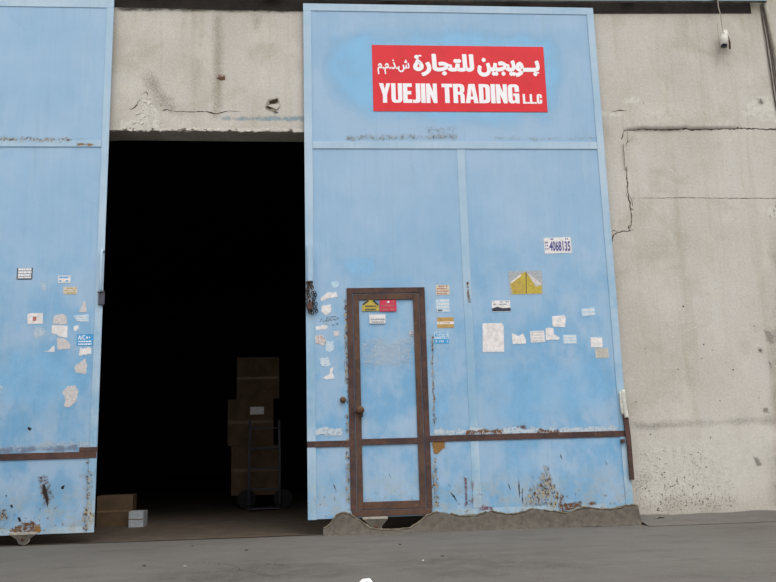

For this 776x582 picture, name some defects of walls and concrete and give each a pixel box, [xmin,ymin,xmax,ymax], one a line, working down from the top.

spalling [116,93,304,133]
corrosion [0,137,94,146]
crack [621,127,776,144]
crack [612,167,633,241]
leakage [631,295,776,432]
corrosion [430,335,618,511]
corrosion [0,440,90,454]
corrosion [316,415,350,504]
corrosion [0,495,41,534]
corrosion [38,475,65,507]
corrosion [80,458,97,531]